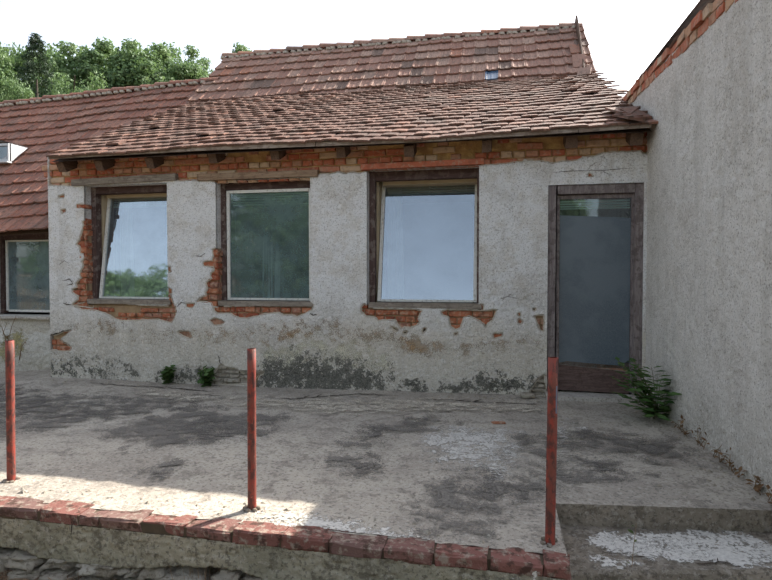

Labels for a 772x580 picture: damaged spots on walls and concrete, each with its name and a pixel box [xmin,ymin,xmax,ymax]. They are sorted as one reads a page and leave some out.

spalling [42,132,648,198]
spalling [71,204,314,325]
water stain [0,329,28,360]
water stain [51,355,204,384]
water stain [203,319,540,405]
spalling [361,304,427,334]
spalling [441,304,503,339]
spalling [533,308,545,332]
water stain [0,382,295,453]
water stain [133,458,186,479]
water stain [255,403,547,540]
water stain [556,417,705,498]